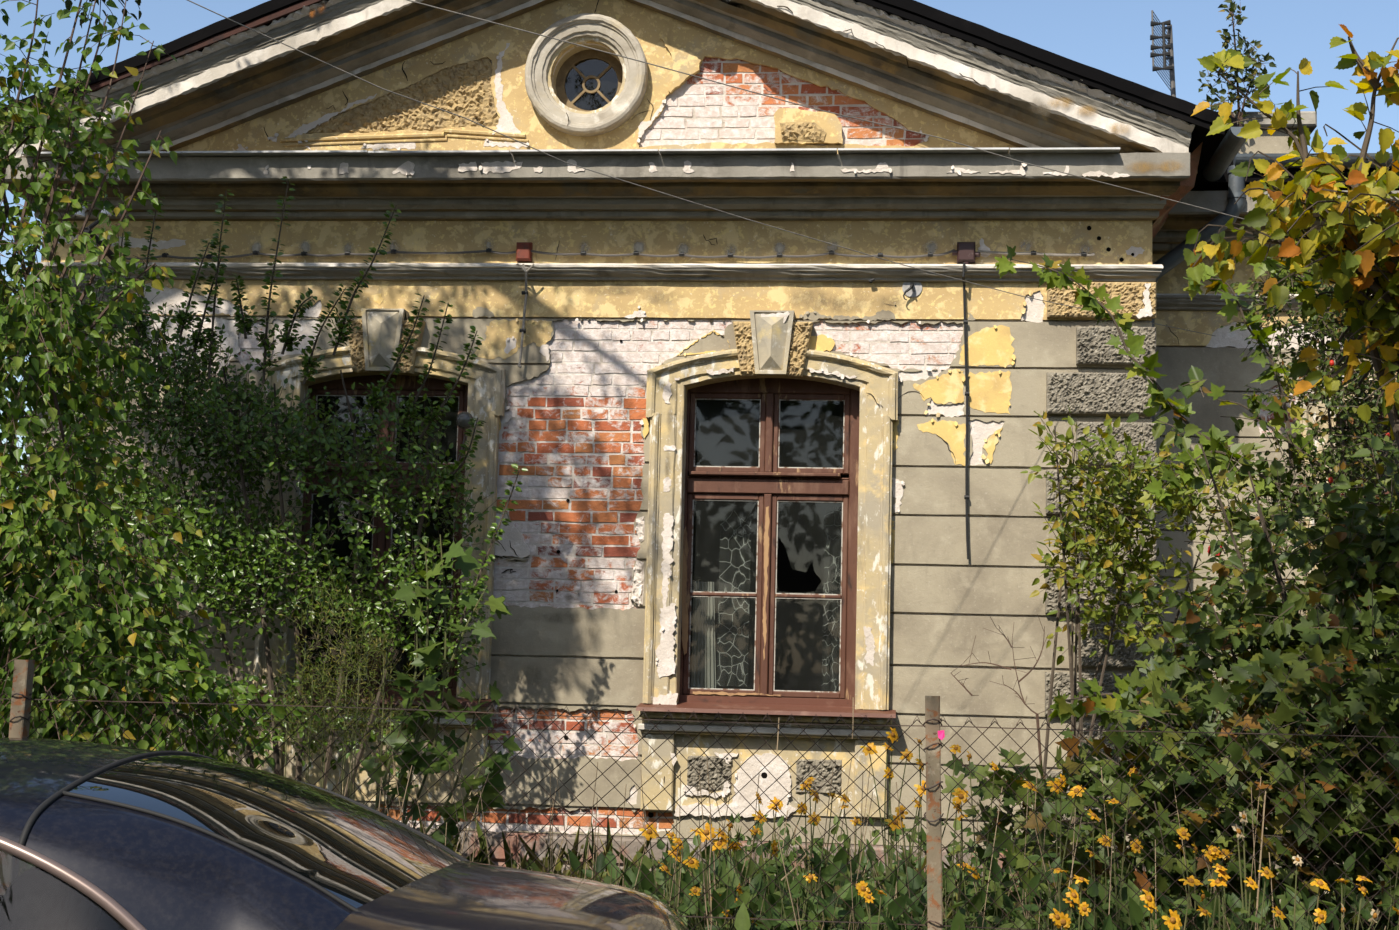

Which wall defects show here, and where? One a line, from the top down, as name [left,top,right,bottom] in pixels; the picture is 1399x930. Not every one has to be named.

flaking render [637,57,929,173]
peeling [567,159,585,173]
peeling [947,163,1027,176]
peeling [1043,166,1130,178]
flaking render [761,290,1045,466]
flaking render [472,306,733,610]
peeling [656,513,688,678]
peeling [762,506,770,659]
flaking render [487,705,639,761]
peeling [649,691,781,705]
flaking render [378,753,797,835]